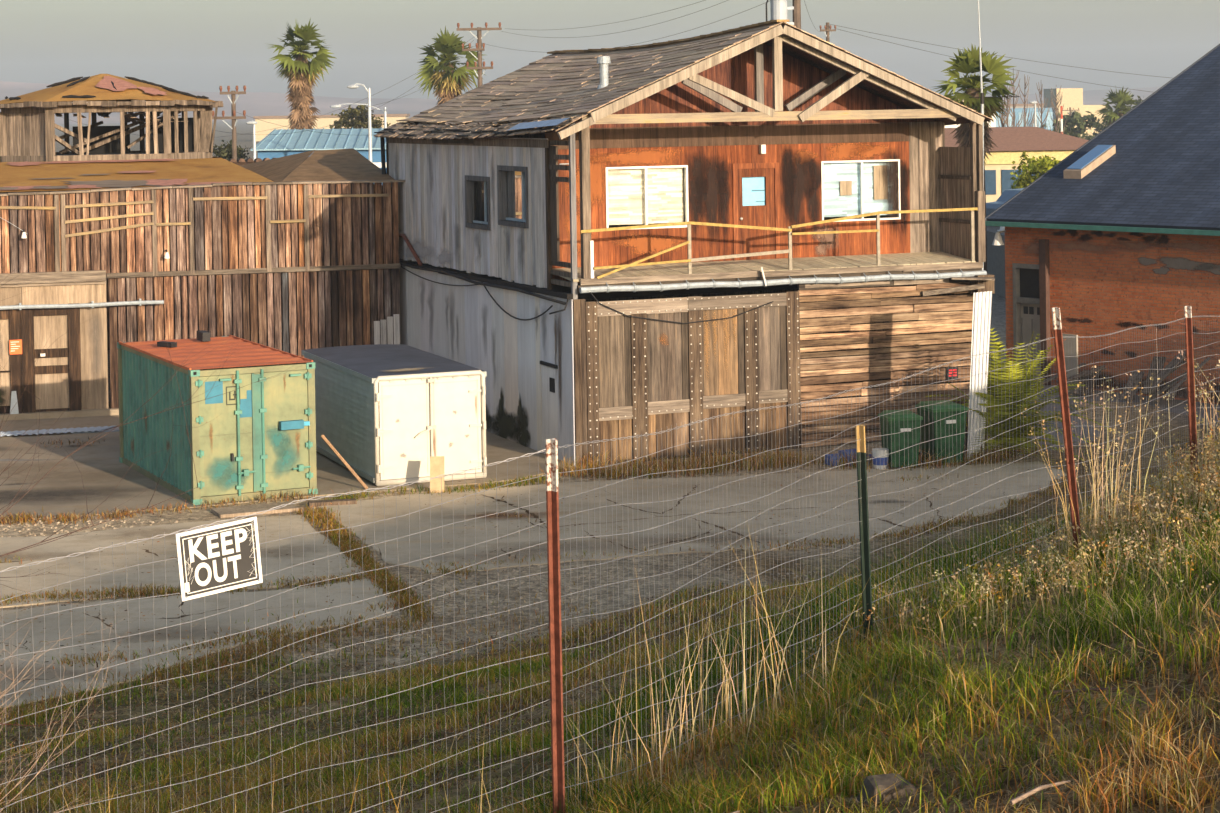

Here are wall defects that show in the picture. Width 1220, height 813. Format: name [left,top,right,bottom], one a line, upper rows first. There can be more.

spalling [1053,229,1220,275]
crack [481,484,838,551]